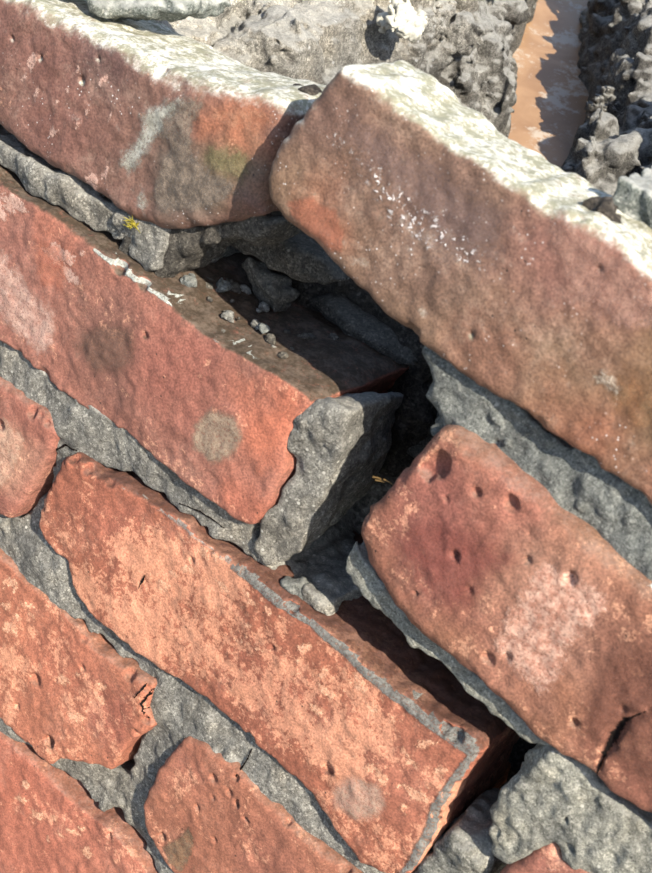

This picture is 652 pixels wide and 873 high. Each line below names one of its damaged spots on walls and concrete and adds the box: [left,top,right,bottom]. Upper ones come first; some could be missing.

crack [134,683,155,718]
crack [596,711,647,777]